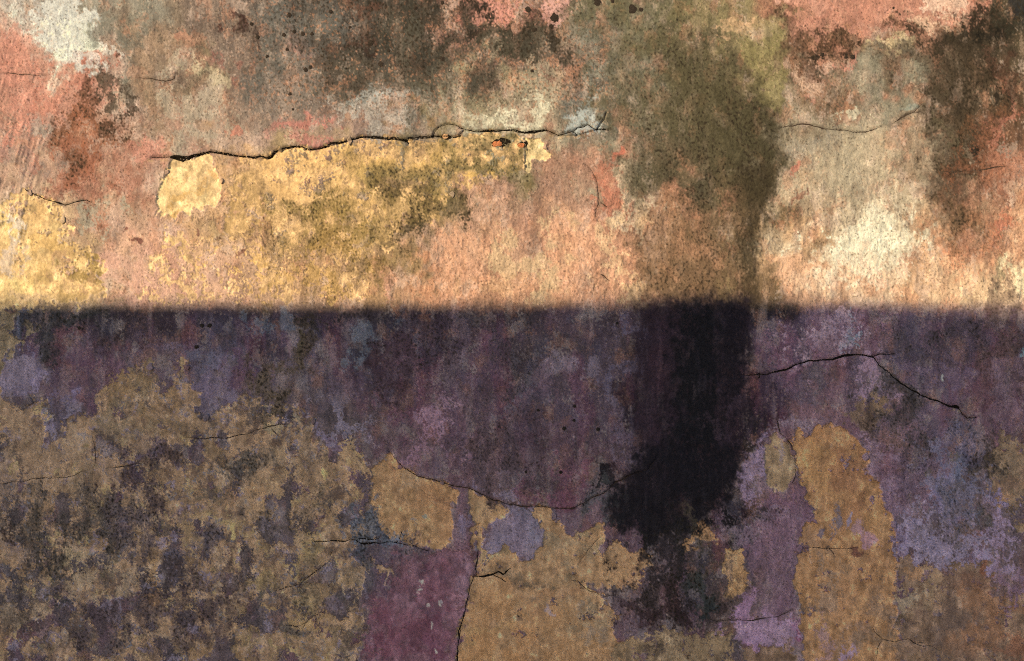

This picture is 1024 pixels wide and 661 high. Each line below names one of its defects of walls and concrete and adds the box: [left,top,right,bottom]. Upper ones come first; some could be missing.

crack [152,112,607,159]
flaking render [441,128,552,163]
peeling [449,173,496,198]
peeling [134,132,398,308]
damp [197,0,1024,646]
crack [741,353,976,419]
peeling [0,186,1024,661]
crack [389,451,656,509]
crack [456,552,510,661]